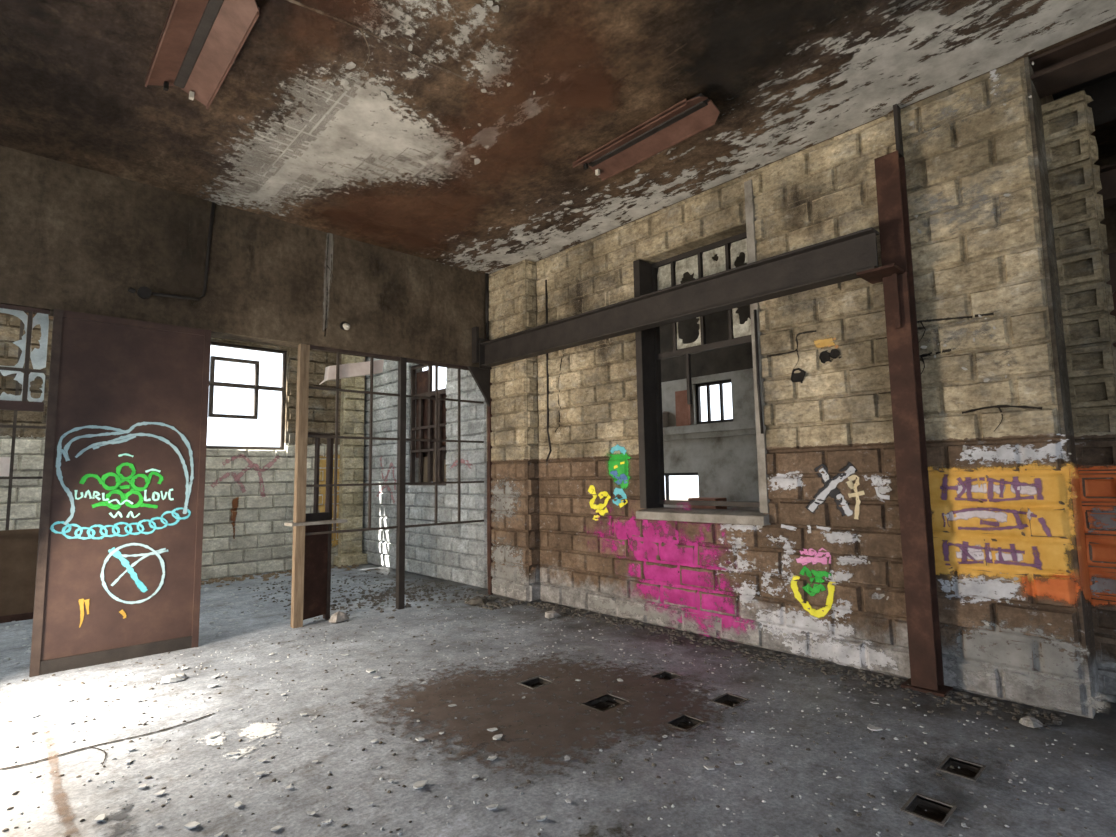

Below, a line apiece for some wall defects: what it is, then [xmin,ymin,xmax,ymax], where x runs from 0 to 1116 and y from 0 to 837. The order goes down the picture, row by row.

peeling [200,0,520,218]
peeling [421,0,1116,274]
peeling [957,433,1071,466]
peeling [487,479,531,596]
peeling [944,619,1108,713]